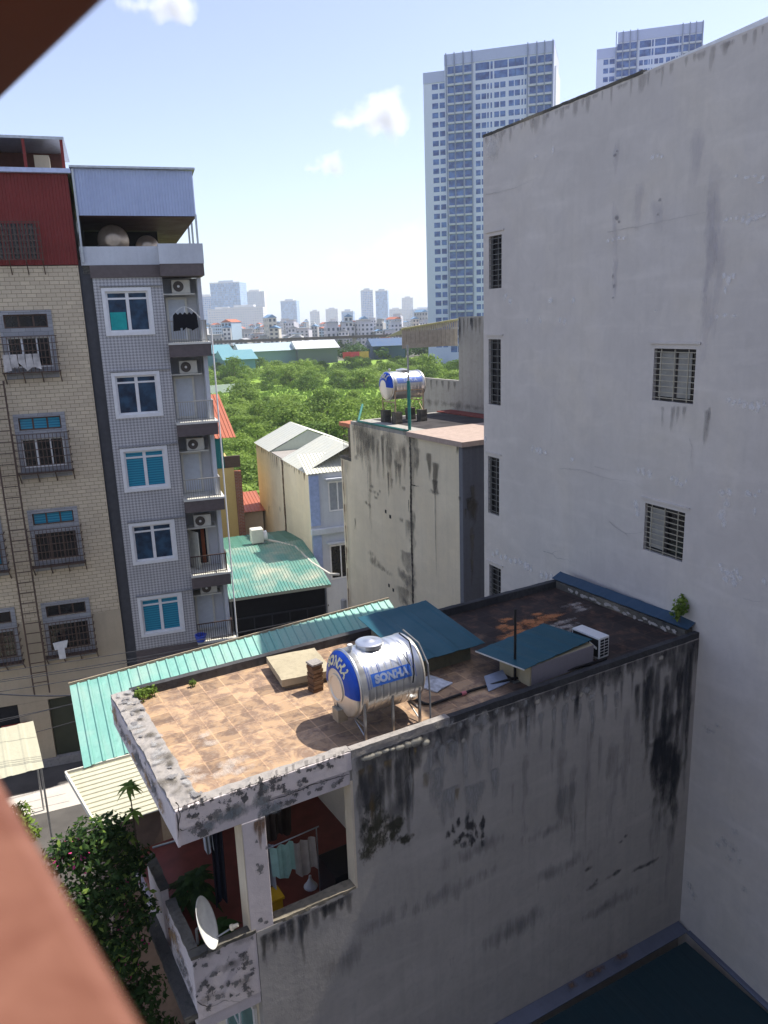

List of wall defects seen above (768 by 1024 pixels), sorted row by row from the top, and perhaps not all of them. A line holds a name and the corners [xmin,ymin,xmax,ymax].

leakage [427,454,438,491]
peeling [110,690,344,838]
leakage [358,640,699,860]
peeling [153,893,255,1011]